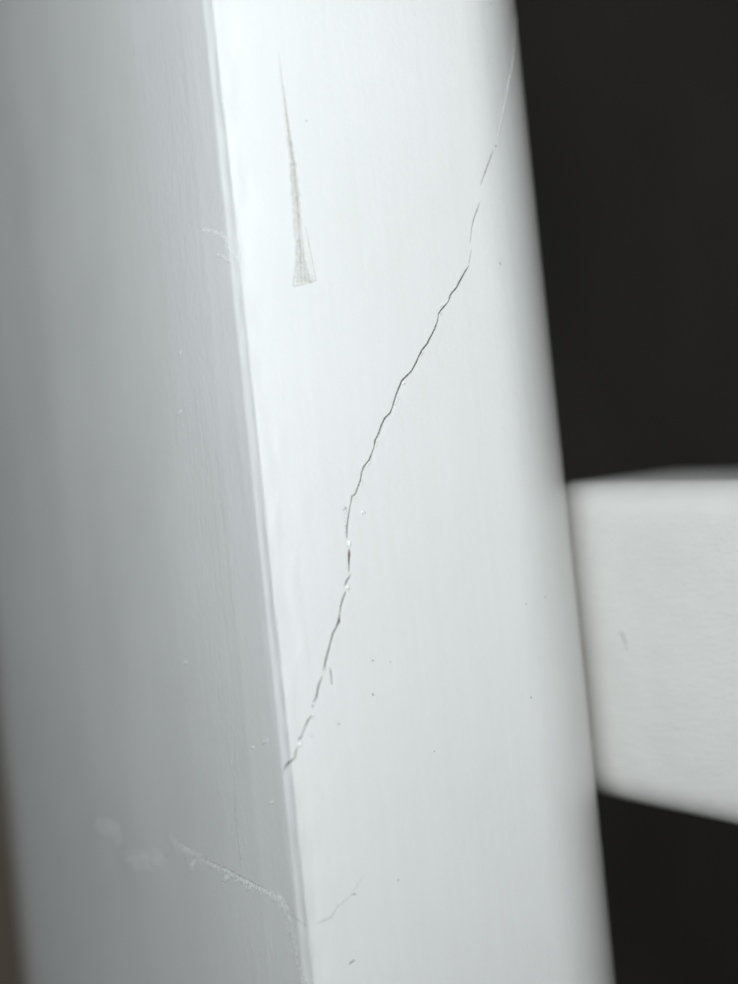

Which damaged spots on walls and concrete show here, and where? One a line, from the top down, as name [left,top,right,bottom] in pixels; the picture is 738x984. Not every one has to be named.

crack [285,266,469,767]